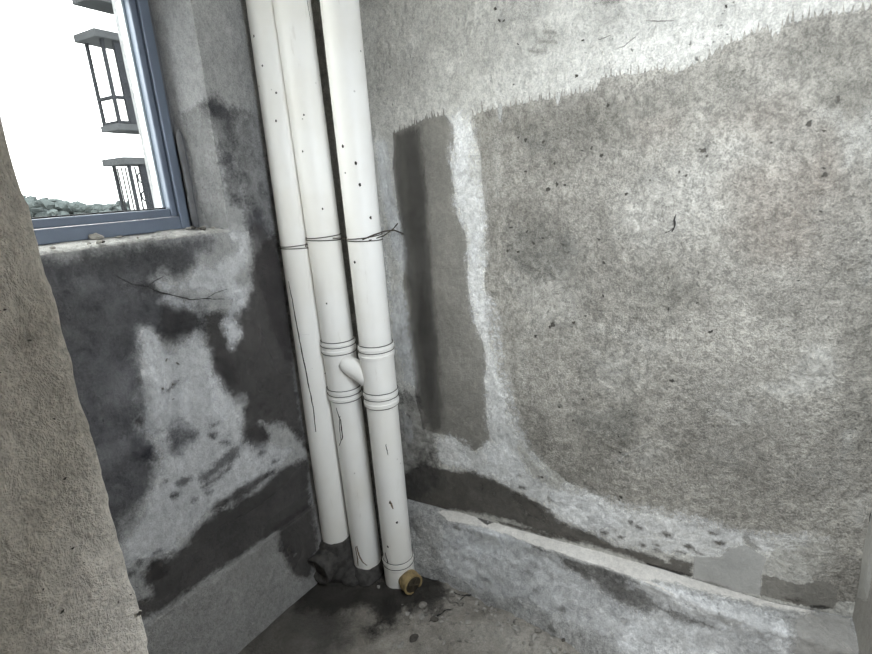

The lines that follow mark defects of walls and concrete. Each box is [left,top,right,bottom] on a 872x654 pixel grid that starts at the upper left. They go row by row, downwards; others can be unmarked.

crack [115,275,227,300]
damp [208,101,229,119]
damp [42,208,447,635]
damp [384,3,872,654]